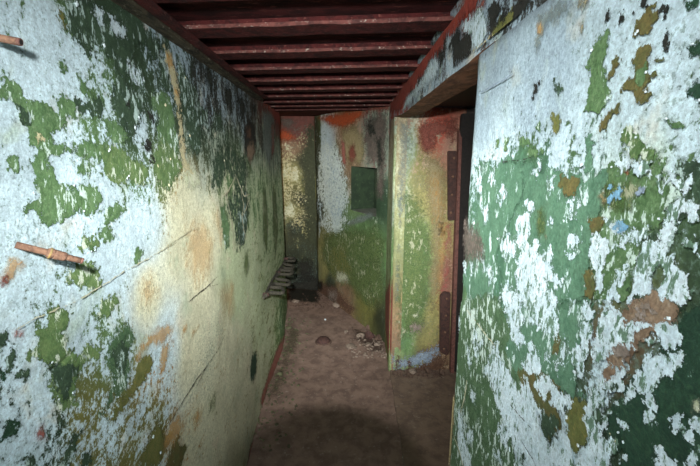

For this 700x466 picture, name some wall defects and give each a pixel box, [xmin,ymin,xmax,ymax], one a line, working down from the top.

leakage [163,44,275,191]
peeling [0,0,203,323]
leakage [218,190,249,275]
leakage [262,184,278,258]
peeling [390,0,700,466]
crack [18,228,198,329]
peeling [22,303,154,440]
peeling [0,418,20,443]
peeling [23,453,38,466]
peeling [60,428,95,466]
peeling [141,424,187,466]